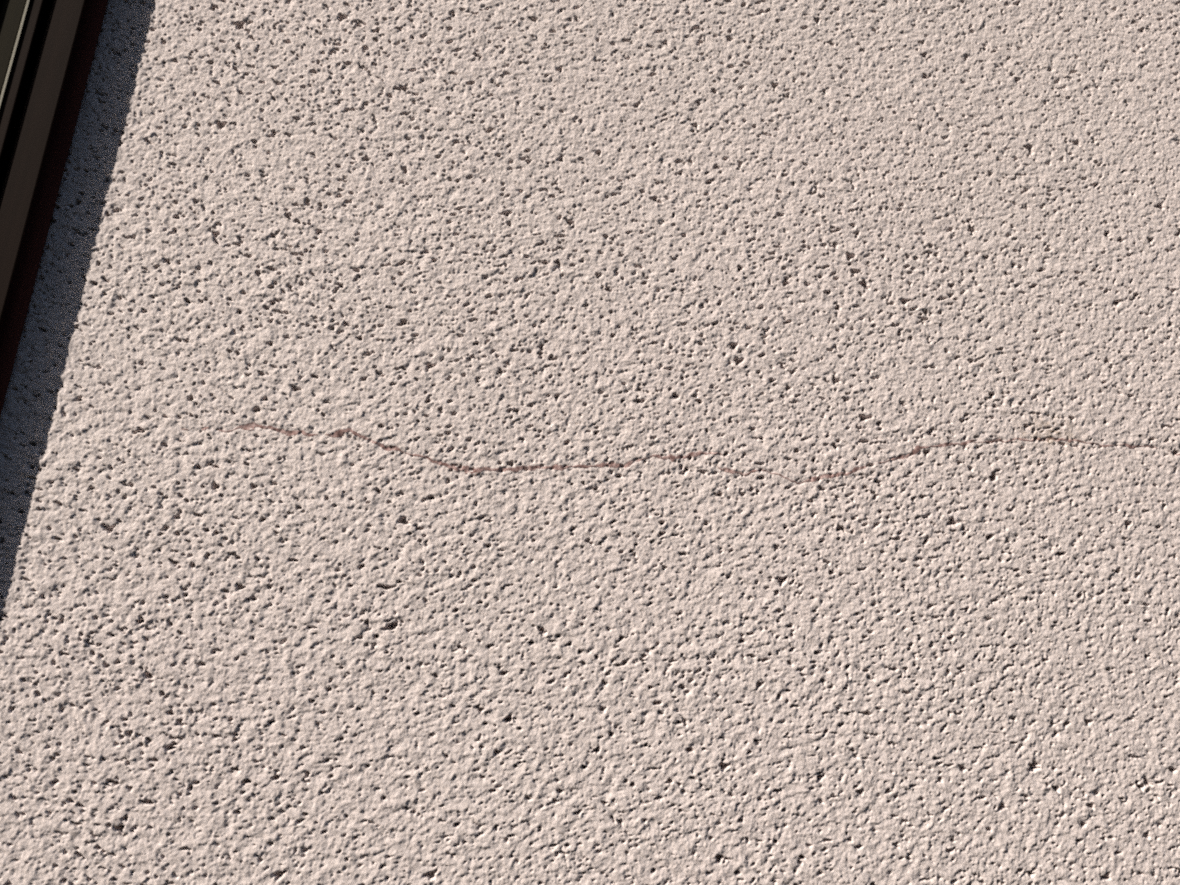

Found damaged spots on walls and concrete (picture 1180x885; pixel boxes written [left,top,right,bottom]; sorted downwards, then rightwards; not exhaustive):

crack [181,422,1180,484]